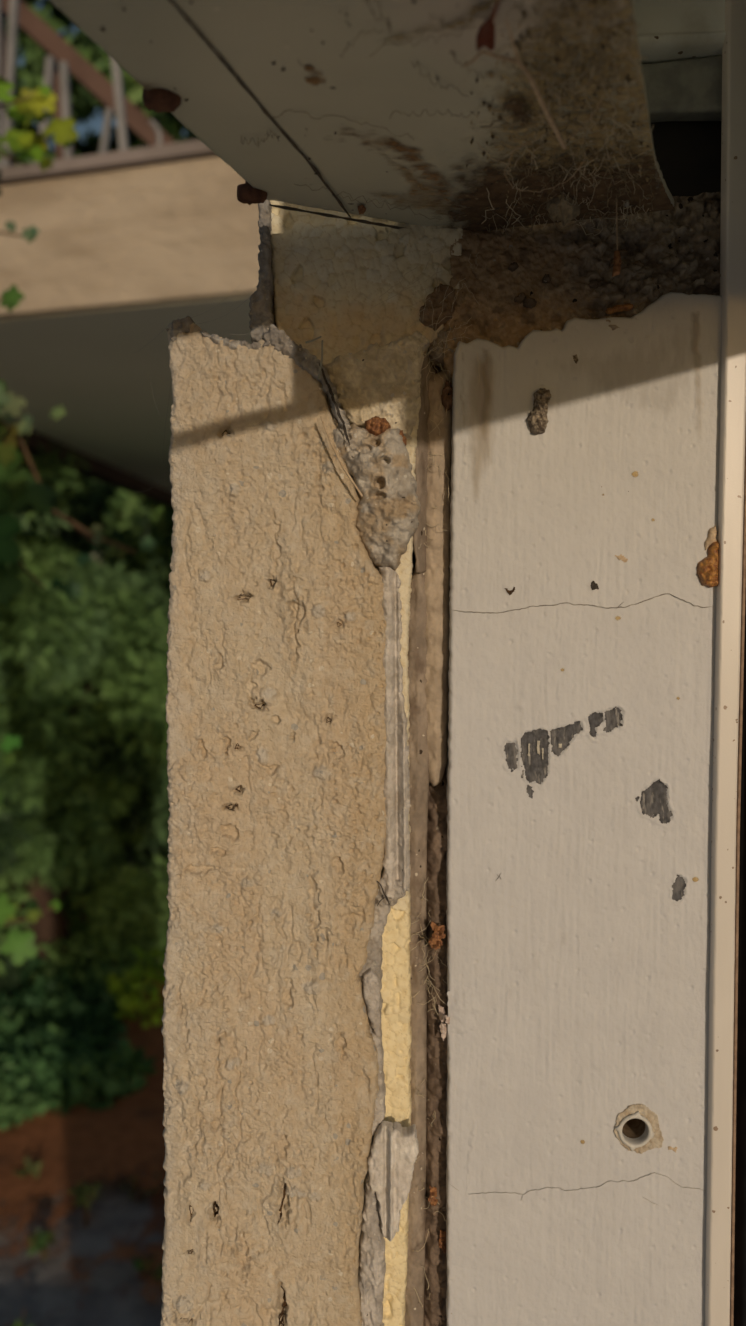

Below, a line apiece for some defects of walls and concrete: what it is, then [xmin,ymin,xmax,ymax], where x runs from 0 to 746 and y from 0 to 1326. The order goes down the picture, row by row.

spalling [166,192,721,571]
peeling [504,707,623,798]
peeling [635,779,673,824]
peeling [672,875,686,901]
spalling [358,875,419,1326]